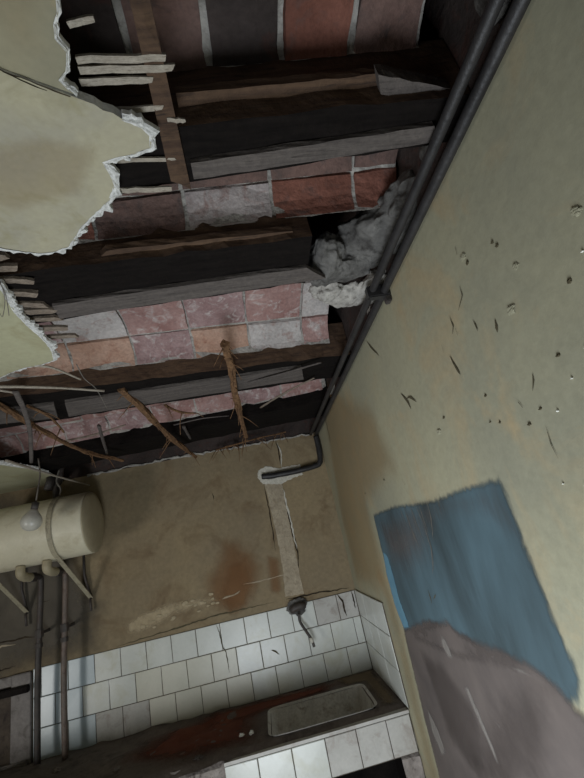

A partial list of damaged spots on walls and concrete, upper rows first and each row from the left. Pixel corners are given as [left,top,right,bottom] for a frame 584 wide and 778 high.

flaking render [53,0,79,97]
crack [0,69,71,97]
flaking render [0,109,160,256]
flaking render [0,279,60,379]
flaking render [0,460,49,473]
flaking render [87,434,309,477]
crack [223,487,299,599]
rust [216,554,252,608]
flaking render [129,593,219,631]
crack [0,636,32,648]
flaking render [404,621,584,778]